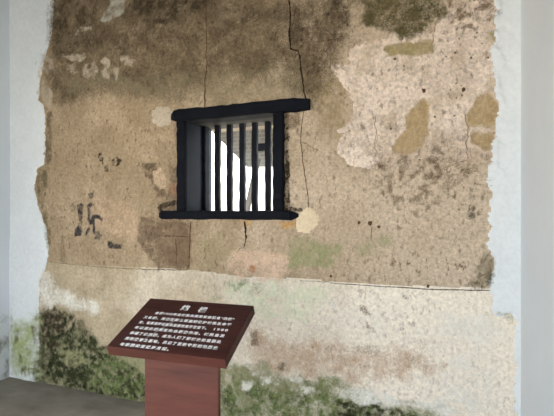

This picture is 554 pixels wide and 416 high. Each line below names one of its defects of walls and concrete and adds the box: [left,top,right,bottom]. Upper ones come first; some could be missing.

flaking render [62,53,134,80]
flaking render [101,0,125,23]
crack [202,0,210,107]
water stain [36,0,448,141]
crack [288,0,307,99]
flaking render [332,0,499,173]
crack [300,112,316,207]
crack [237,220,253,252]
water stain [35,267,102,317]
water stain [0,308,46,381]
water stain [204,276,513,416]